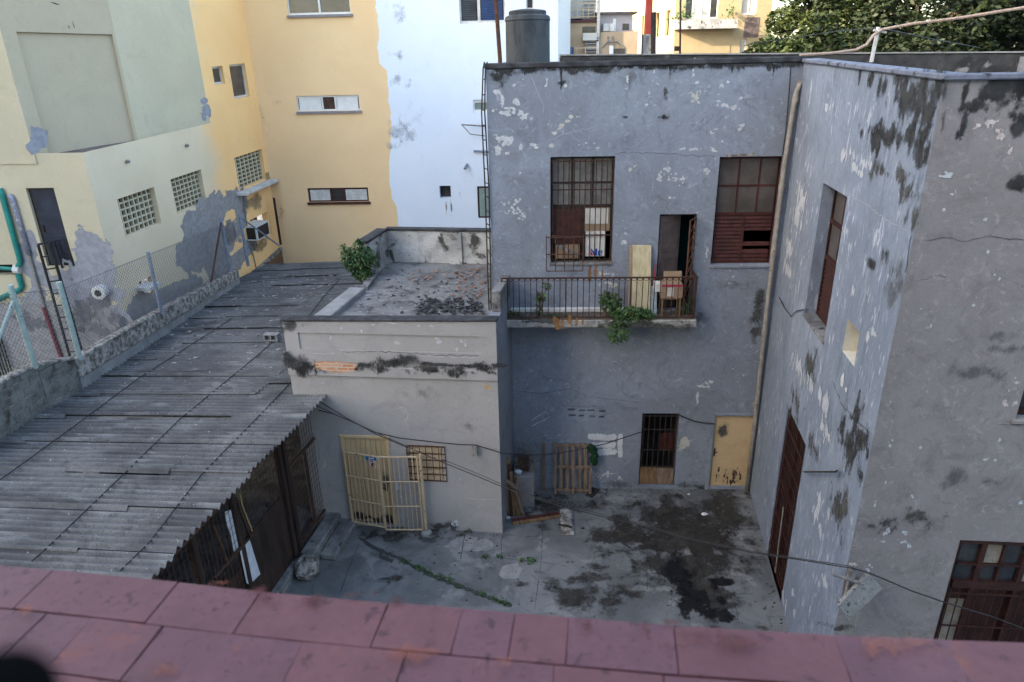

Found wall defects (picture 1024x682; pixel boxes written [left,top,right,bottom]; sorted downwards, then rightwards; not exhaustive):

peeling [492,79,533,120]
water stain [956,72,1024,139]
peeling [492,115,578,156]
water stain [858,45,950,232]
water stain [1007,174,1024,192]
crack [848,193,1022,282]
flaking render [313,361,357,373]
water stain [355,354,507,378]
water stain [837,390,869,486]
water stain [830,491,847,543]
water stain [546,482,759,649]